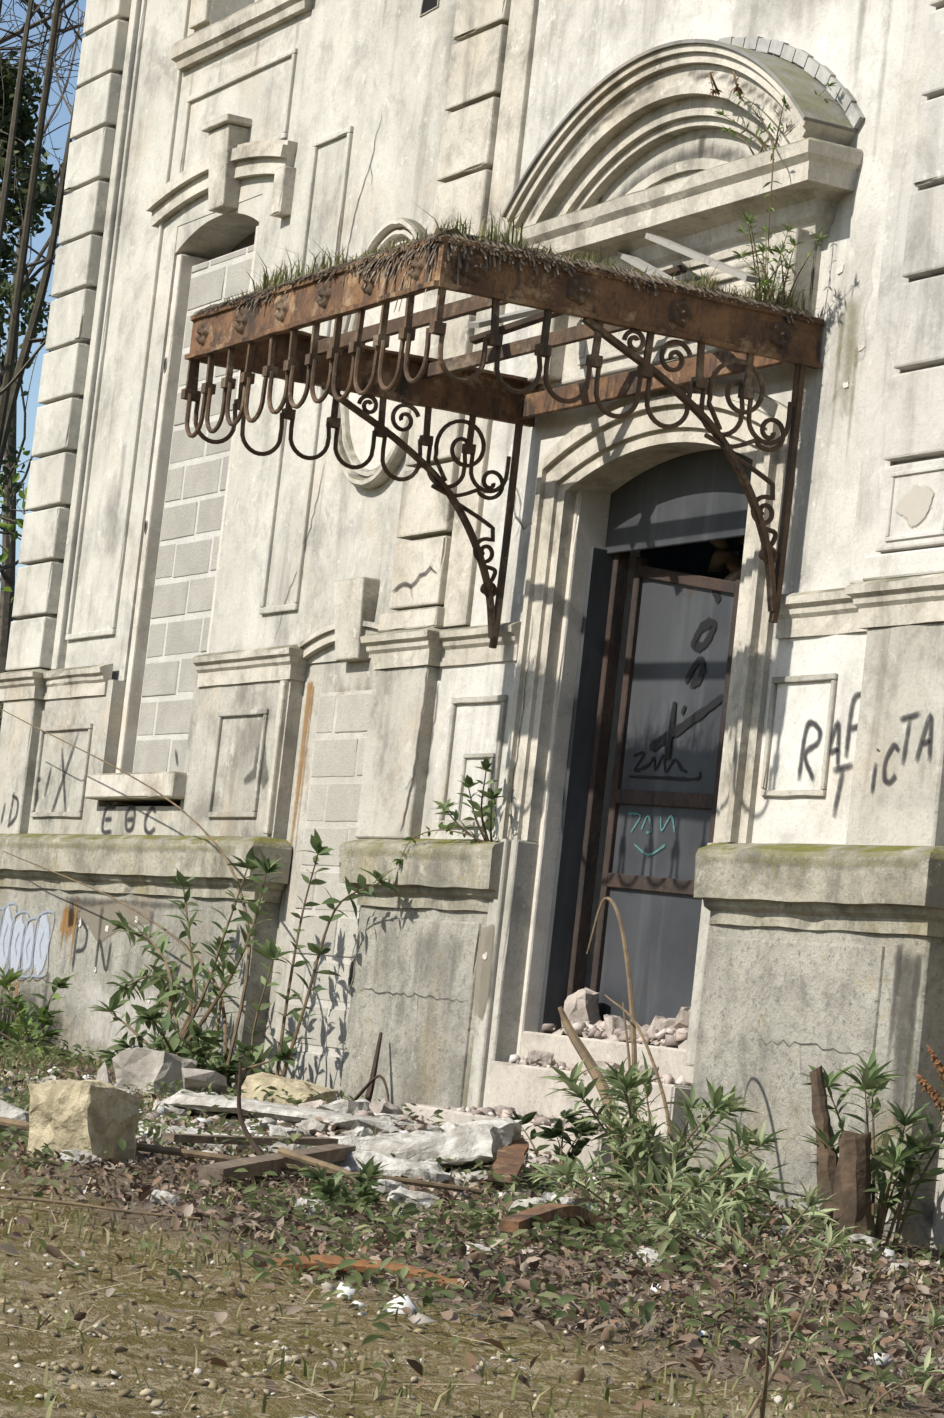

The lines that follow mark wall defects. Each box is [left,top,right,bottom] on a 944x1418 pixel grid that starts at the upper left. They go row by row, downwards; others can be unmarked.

flaking render [895,485,934,527]
rust [290,683,314,845]